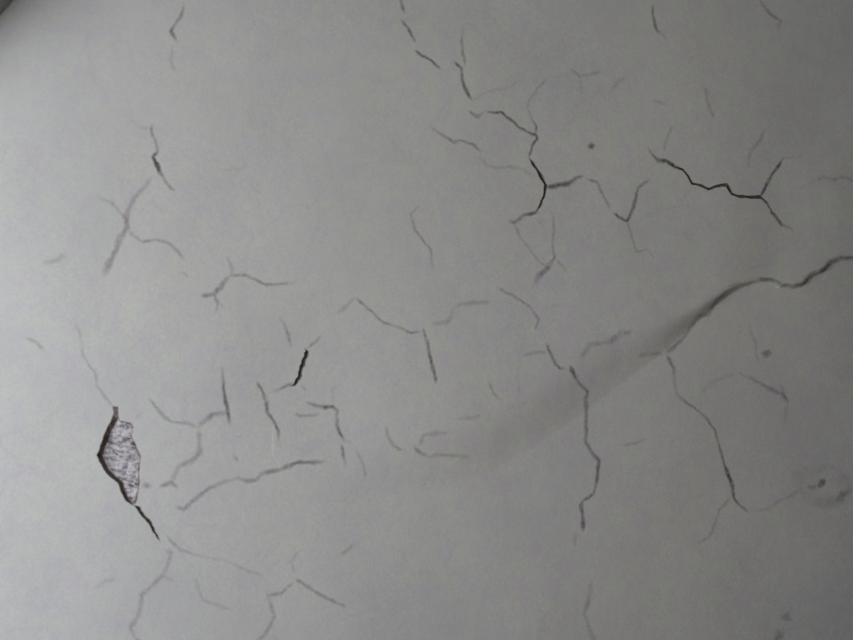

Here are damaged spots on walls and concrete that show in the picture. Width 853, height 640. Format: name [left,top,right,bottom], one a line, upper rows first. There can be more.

crack [528,134,570,215]
crack [662,160,780,213]
crack [291,349,309,387]
spalling [97,406,141,505]
crack [134,505,160,541]